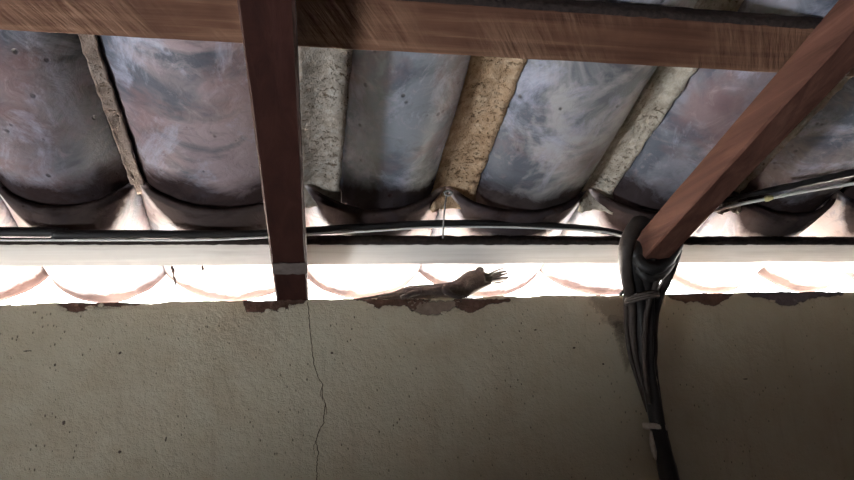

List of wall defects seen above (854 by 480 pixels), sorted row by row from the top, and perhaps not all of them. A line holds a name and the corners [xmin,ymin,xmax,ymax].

spalling [243,300,306,313]
peeling [354,298,511,318]
crack [307,302,327,480]